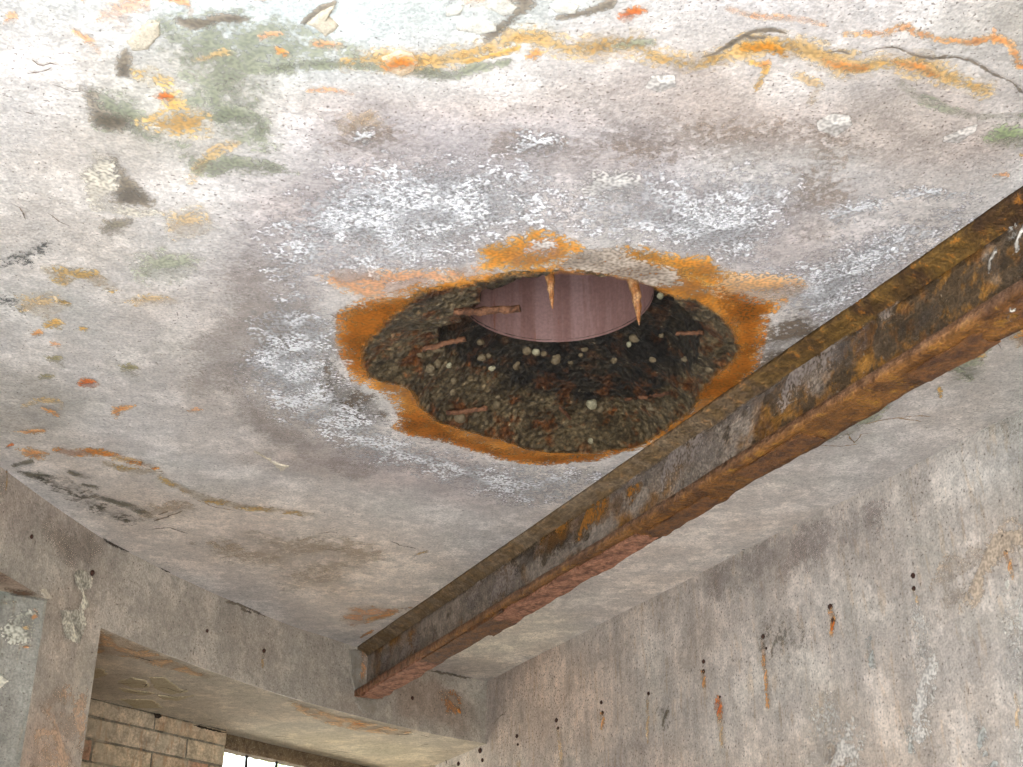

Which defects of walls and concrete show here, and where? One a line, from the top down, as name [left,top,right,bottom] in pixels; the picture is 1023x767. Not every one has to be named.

leakage [175,13,249,30]
corrosion [617,5,646,19]
corrosion [414,31,989,94]
crack [825,47,1023,93]
corrosion [885,23,1023,69]
leakage [89,90,159,142]
leakage [172,84,309,195]
peeling [525,238,557,252]
spalling [359,248,741,454]
corrosion [328,229,804,466]
leakage [236,127,982,507]
corrosion [534,497,609,558]